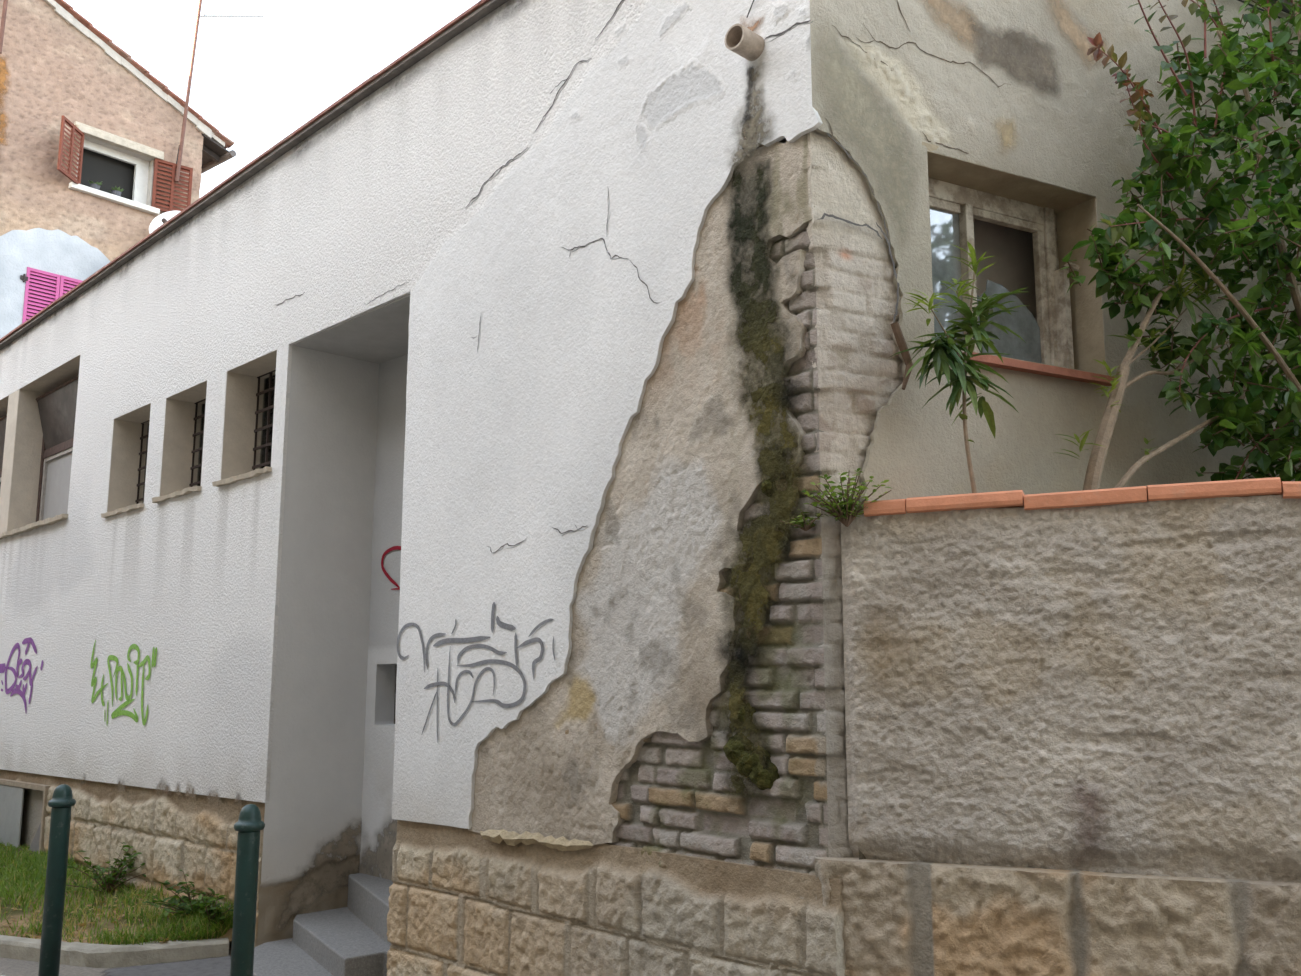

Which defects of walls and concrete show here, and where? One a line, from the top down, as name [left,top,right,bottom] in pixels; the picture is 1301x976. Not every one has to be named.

crack [465,0,625,209]
damp [732,67,770,166]
crack [765,1,1011,87]
damp [927,0,1058,93]
crack [562,187,661,304]
flaking render [468,128,904,875]